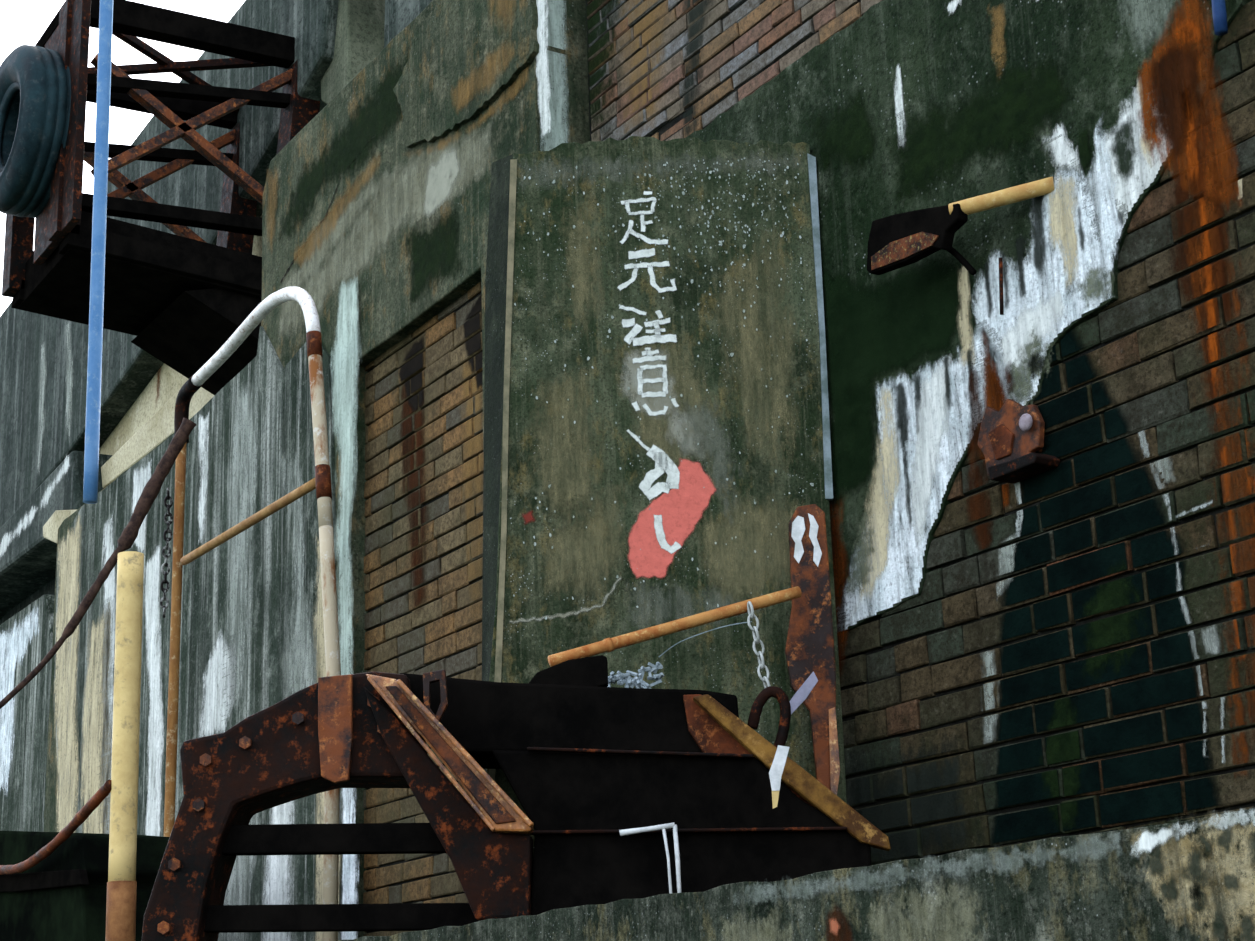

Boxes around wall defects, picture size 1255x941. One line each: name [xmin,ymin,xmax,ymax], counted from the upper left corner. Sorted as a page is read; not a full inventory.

damp [0,609,39,790]
damp [54,518,115,834]
damp [132,460,164,836]
damp [201,388,258,737]
damp [282,282,358,696]
peeling [280,70,527,334]
damp [894,67,906,146]
peeling [988,424,1015,460]
damp [837,82,1173,631]
rust [1139,0,1255,773]
damp [224,855,290,905]
damp [338,854,359,904]